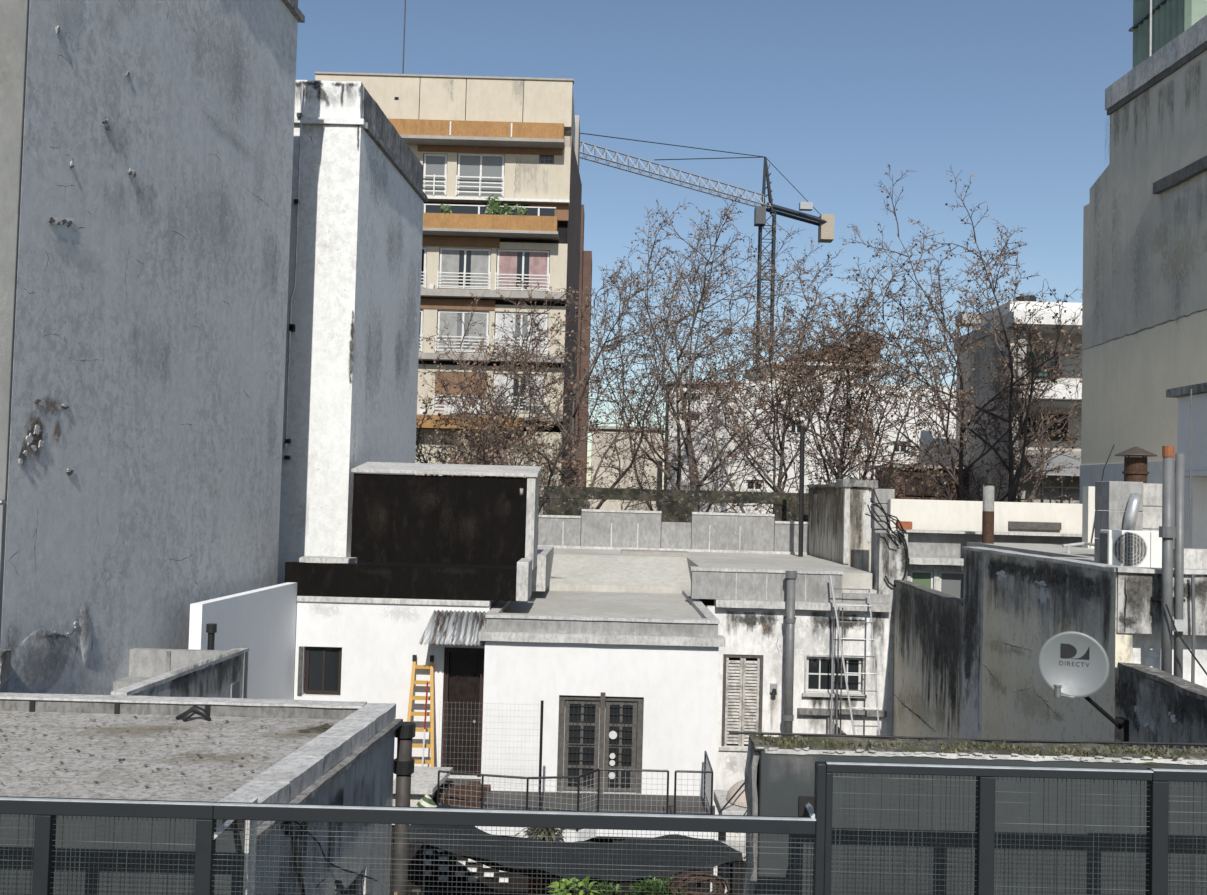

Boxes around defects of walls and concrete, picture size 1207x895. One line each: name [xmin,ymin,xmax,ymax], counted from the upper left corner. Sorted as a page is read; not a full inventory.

peeling [18,425,44,465]
water stain [727,611,775,631]
water stain [813,612,884,639]
water stain [900,557,1162,731]